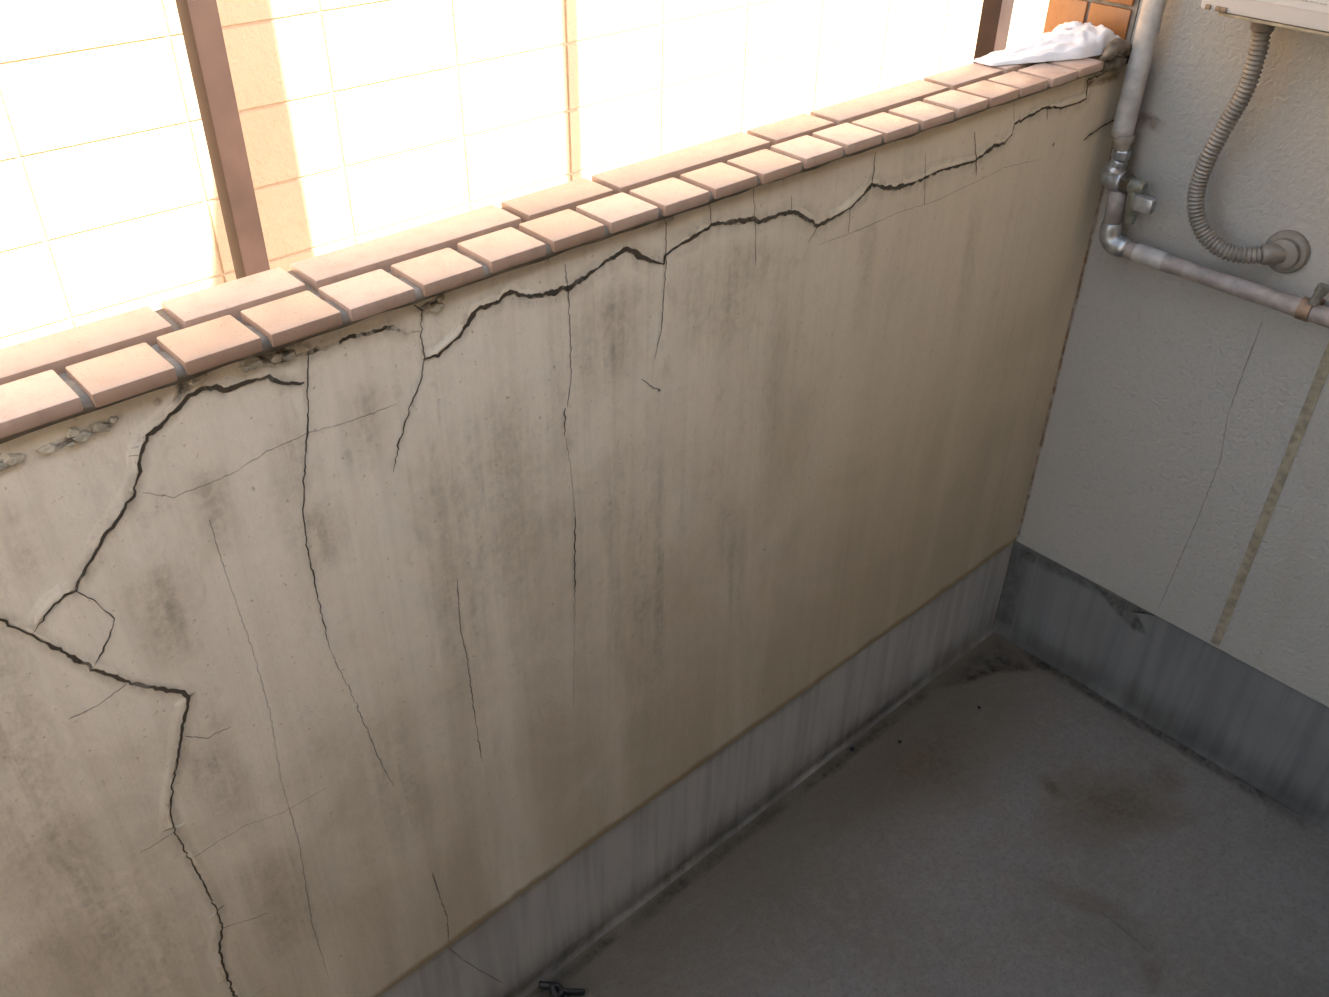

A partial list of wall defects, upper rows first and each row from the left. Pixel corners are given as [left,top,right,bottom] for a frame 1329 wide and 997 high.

crack [0,71,1114,997]